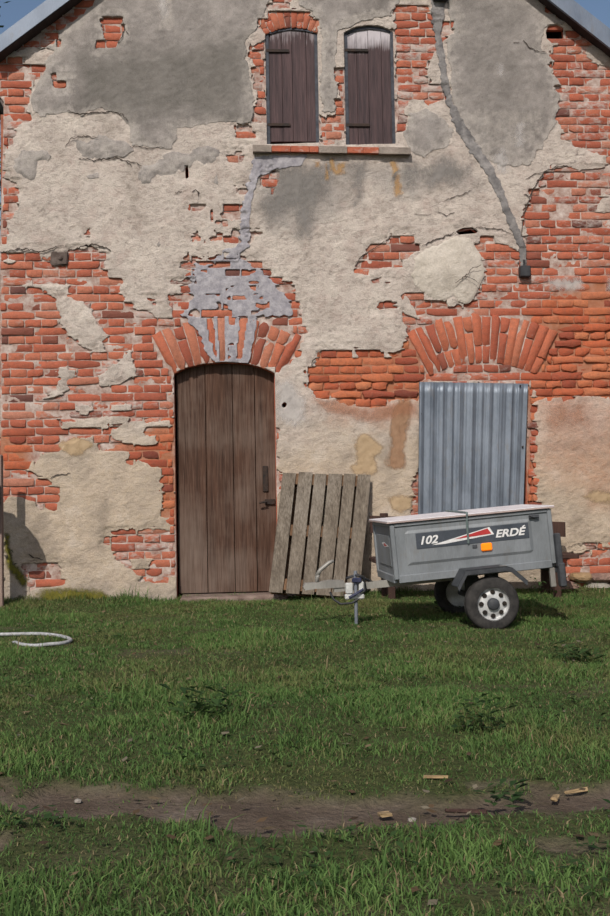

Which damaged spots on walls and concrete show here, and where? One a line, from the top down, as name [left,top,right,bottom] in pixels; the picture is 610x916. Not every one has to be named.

spalling [303,5,610,505]
spalling [0,0,318,583]
spalling [410,470,418,515]
spalling [21,563,65,591]
spalling [563,542,610,586]